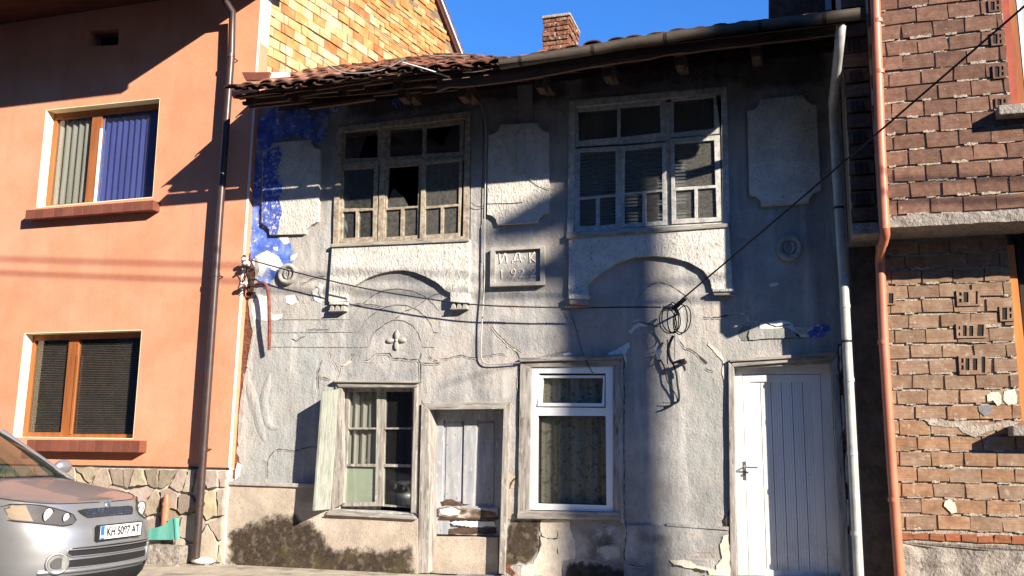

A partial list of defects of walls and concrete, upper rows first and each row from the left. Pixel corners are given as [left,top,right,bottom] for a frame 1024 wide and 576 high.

peeling [232,106,340,480]
spalling [738,320,830,341]
damp [229,514,414,574]
damp [506,520,541,576]
spalling [669,510,731,576]